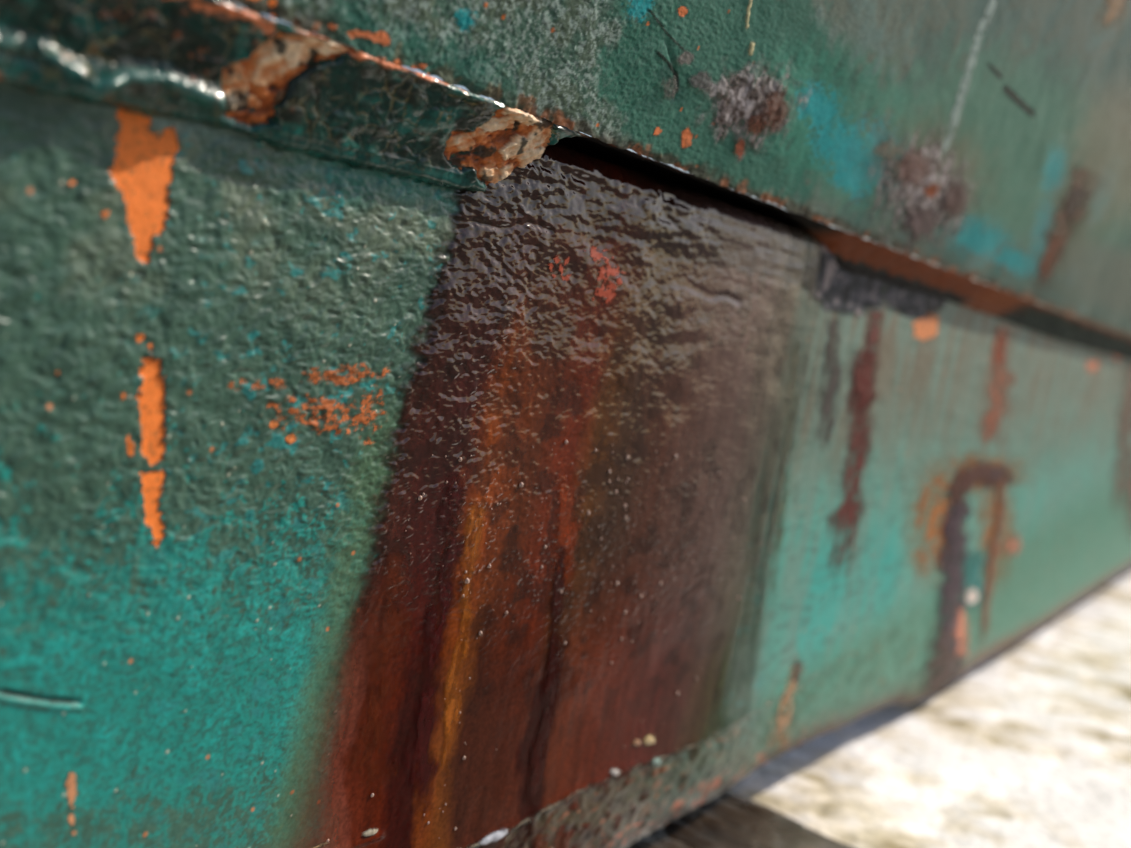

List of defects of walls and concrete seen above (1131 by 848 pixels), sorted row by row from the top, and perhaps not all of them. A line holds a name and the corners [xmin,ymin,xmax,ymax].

peeling [109,109,180,263]
peeling [122,334,166,547]
rust [305,144,815,848]
rust [820,311,883,568]
rust [916,459,1021,695]